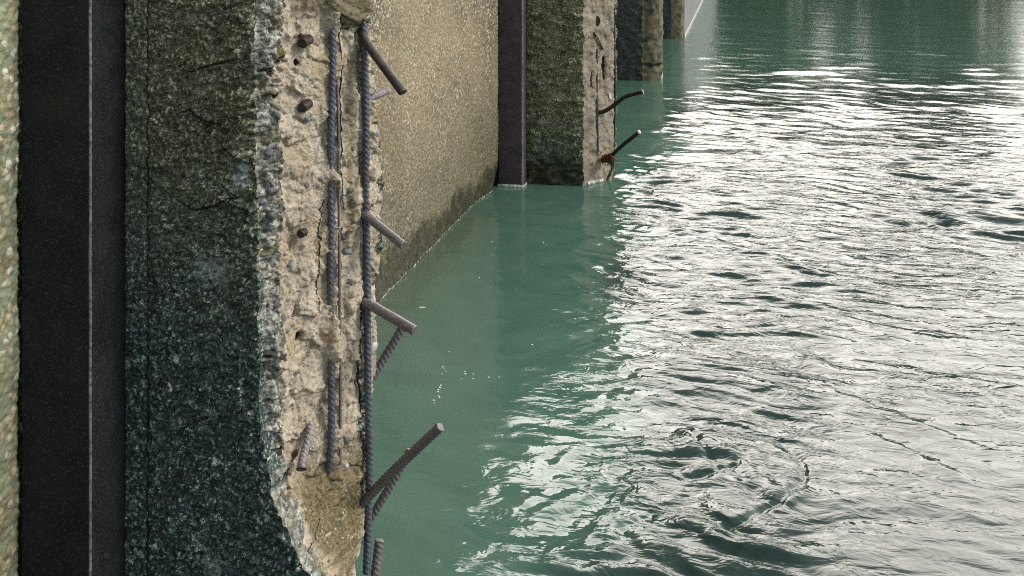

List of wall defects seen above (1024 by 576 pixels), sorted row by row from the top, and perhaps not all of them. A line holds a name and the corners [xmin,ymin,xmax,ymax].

spalling [582,0,618,186]
rust [601,153,615,164]
spalling [250,0,384,576]